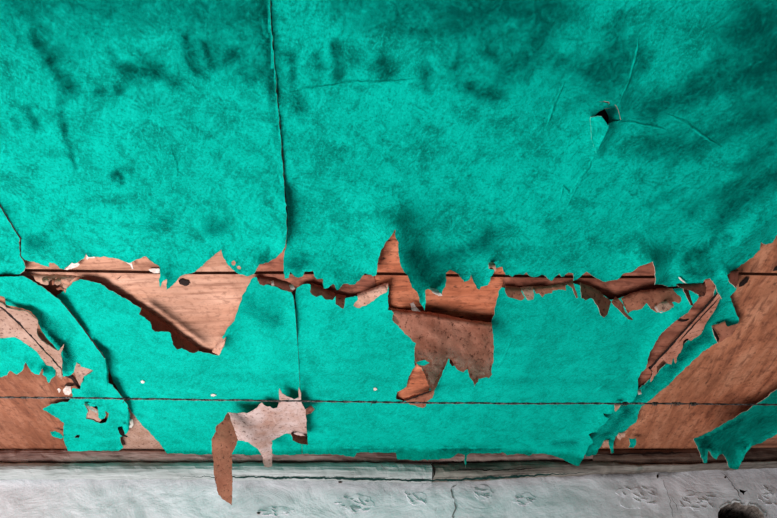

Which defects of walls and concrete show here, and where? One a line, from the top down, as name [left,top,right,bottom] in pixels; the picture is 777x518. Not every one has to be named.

crack [276,89,288,235]
peeling [0,302,93,450]
peeling [212,388,315,505]
peeling [18,231,777,451]